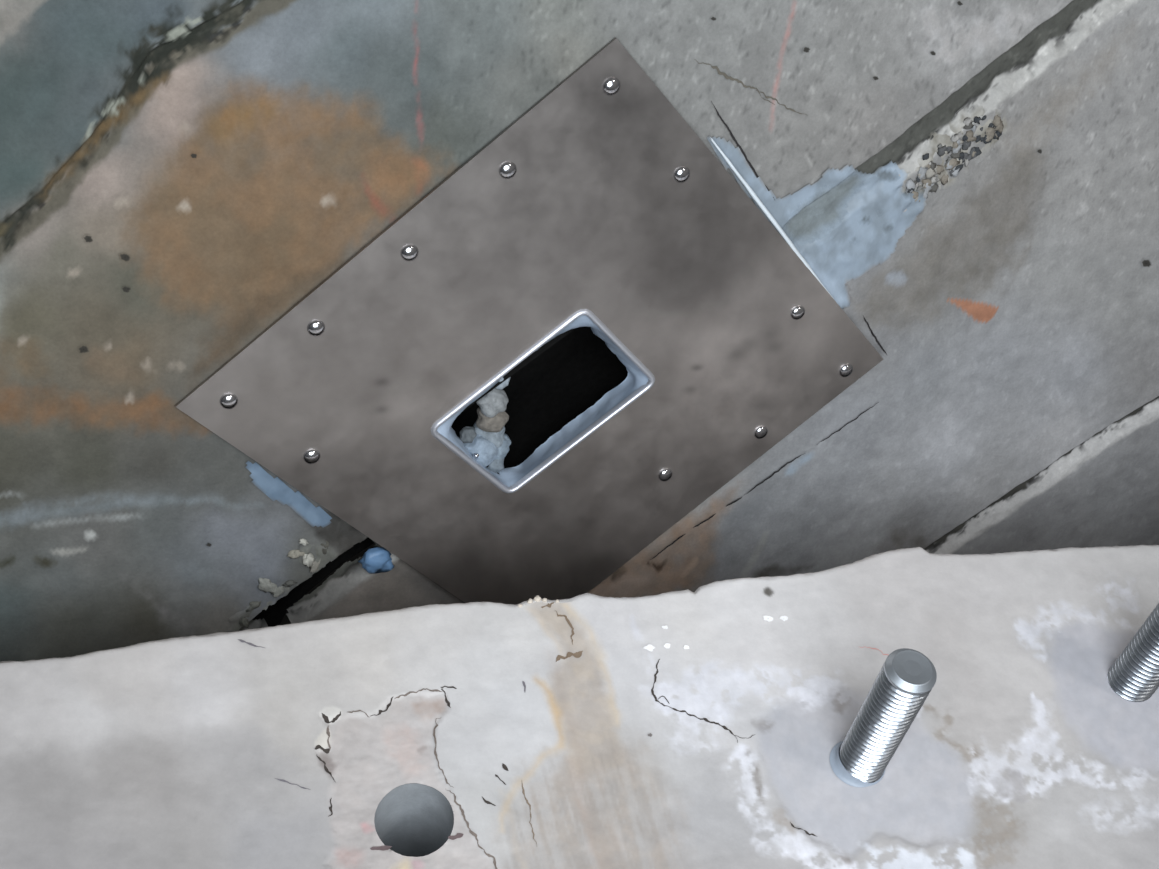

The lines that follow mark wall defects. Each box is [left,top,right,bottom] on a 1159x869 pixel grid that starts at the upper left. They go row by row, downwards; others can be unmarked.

spalling [904,104,1012,202]
rust [0,63,462,446]
spalling [310,686,497,869]
crack [651,659,753,743]